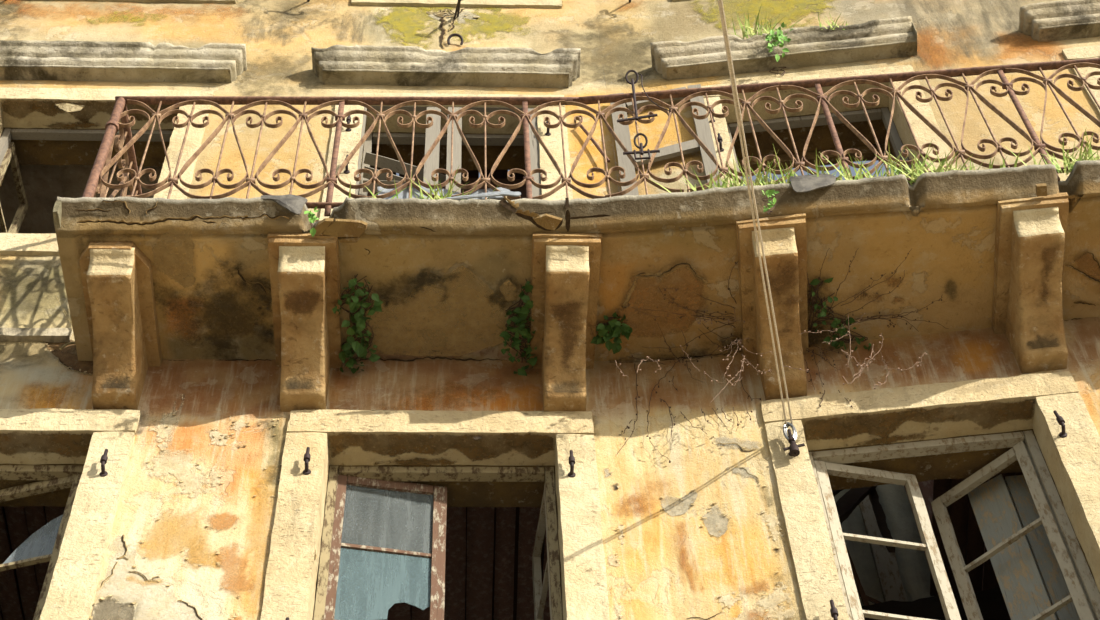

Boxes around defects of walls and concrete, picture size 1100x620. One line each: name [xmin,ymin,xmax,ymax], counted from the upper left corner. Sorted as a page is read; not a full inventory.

leakage [281,7,304,21]
leakage [0,257,64,309]
crack [636,263,705,283]
crack [1065,252,1100,321]
leakage [189,276,272,359]
peeling [143,410,224,498]
peeling [208,418,281,447]
peeling [205,513,239,531]
flaking render [661,489,698,516]
flaking render [701,502,732,537]
flaking render [89,518,253,620]
peeling [717,571,795,620]